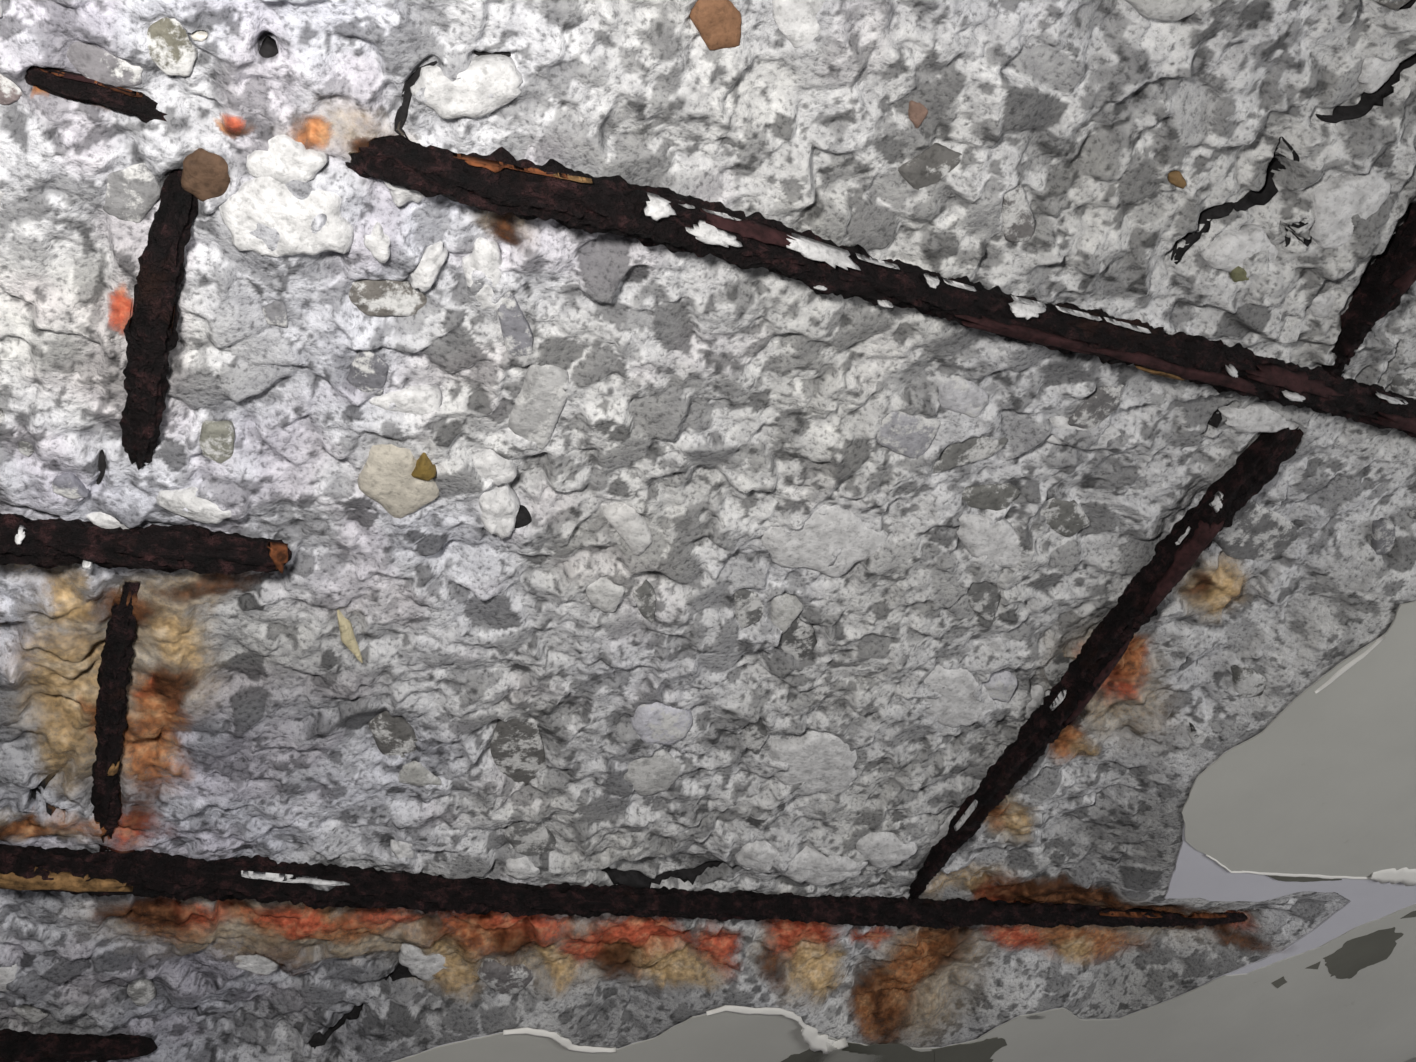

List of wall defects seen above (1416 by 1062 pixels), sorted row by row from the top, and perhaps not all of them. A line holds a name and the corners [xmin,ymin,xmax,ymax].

crack [1399,0,1416,9]
spalling [410,54,523,120]
crack [1316,53,1416,123]
spalling [219,177,354,258]
crack [1171,137,1312,265]
spalling [119,169,198,470]
spalling [345,135,1416,438]
corrosion [0,565,253,842]
corrosion [99,899,414,957]
corrosion [434,910,738,992]
spalling [0,839,1248,1062]
corrosion [852,871,1265,1044]